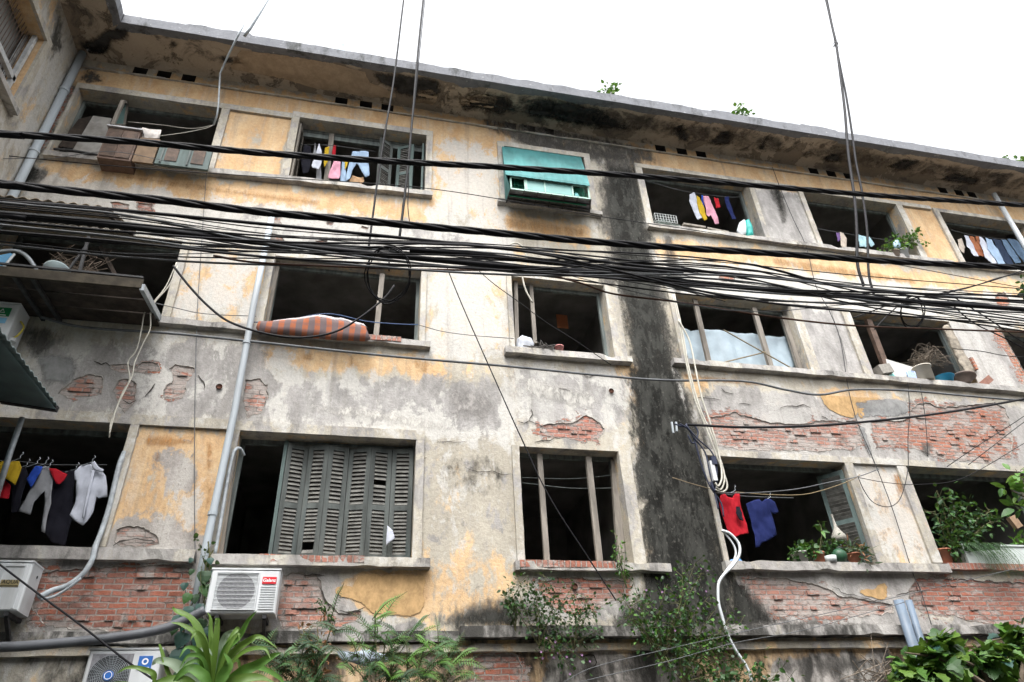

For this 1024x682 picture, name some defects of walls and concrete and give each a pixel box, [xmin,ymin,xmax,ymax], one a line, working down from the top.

water stain [375,73,440,100]
spalling [39,355,195,413]
spalling [242,378,269,419]
water stain [457,94,820,625]
spalling [532,409,605,445]
spalling [703,395,1020,464]
spalling [114,525,160,547]
spalling [27,562,193,632]
spalling [740,573,894,625]
spalling [908,573,1024,625]